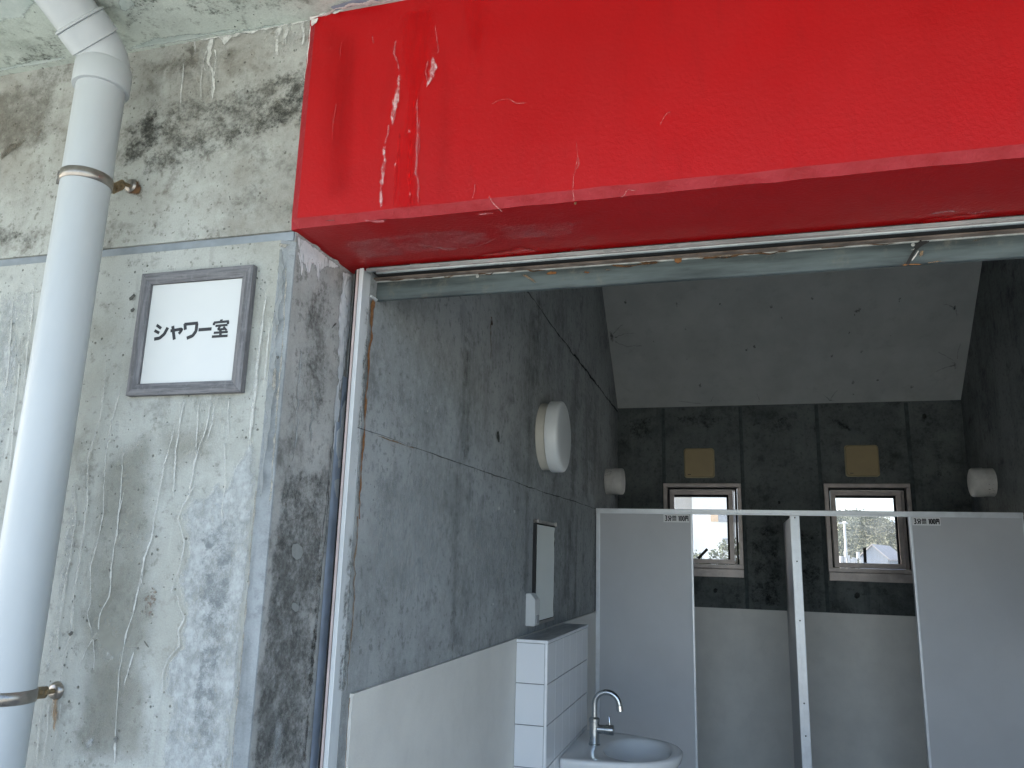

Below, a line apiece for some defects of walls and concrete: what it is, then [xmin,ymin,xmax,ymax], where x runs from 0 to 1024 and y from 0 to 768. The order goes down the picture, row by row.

damp [122,20,308,171]
damp [56,373,184,762]
damp [256,473,323,767]
rust [347,300,375,684]
crack [527,292,618,412]